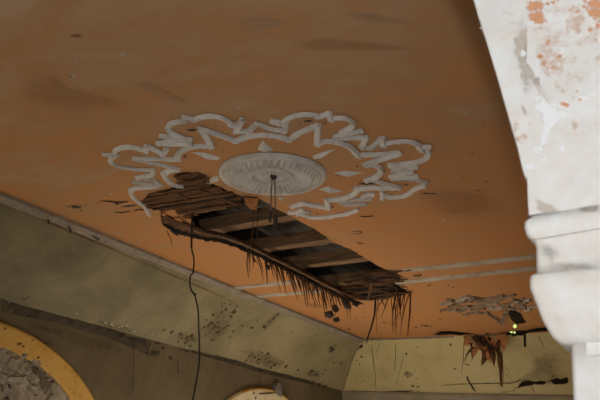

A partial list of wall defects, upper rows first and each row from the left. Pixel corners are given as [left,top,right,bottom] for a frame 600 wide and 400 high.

peeling [527,0,559,29]
peeling [569,0,600,32]
spalling [525,94,569,170]
spalling [21,356,55,396]
crack [442,376,568,394]